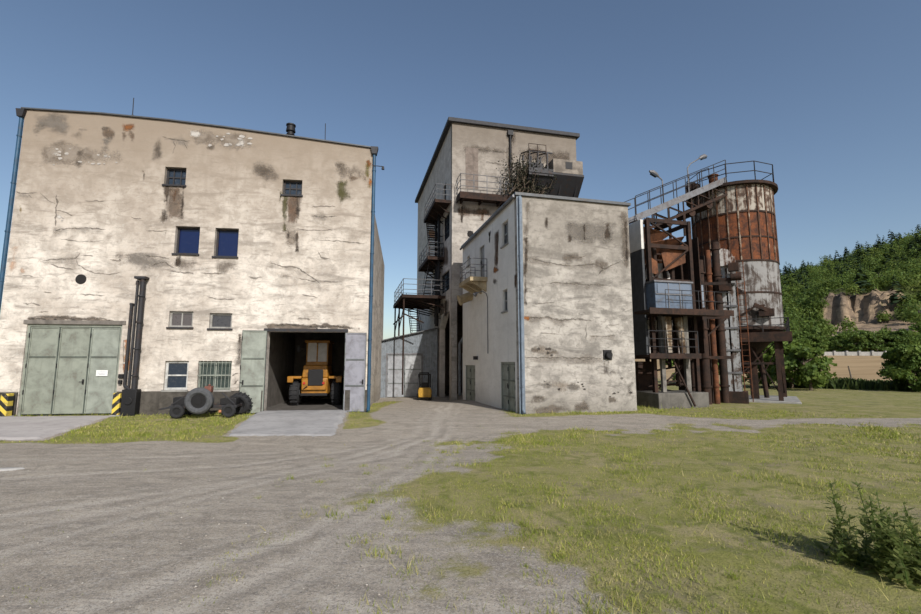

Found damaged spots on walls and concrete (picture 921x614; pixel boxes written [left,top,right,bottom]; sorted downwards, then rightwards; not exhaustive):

spalling [42,142,118,165]
spalling [191,131,253,149]
water stain [255,165,275,179]
water stain [337,163,355,201]
water stain [162,186,185,221]
water stain [280,193,300,252]
corrosion [693,212,778,261]